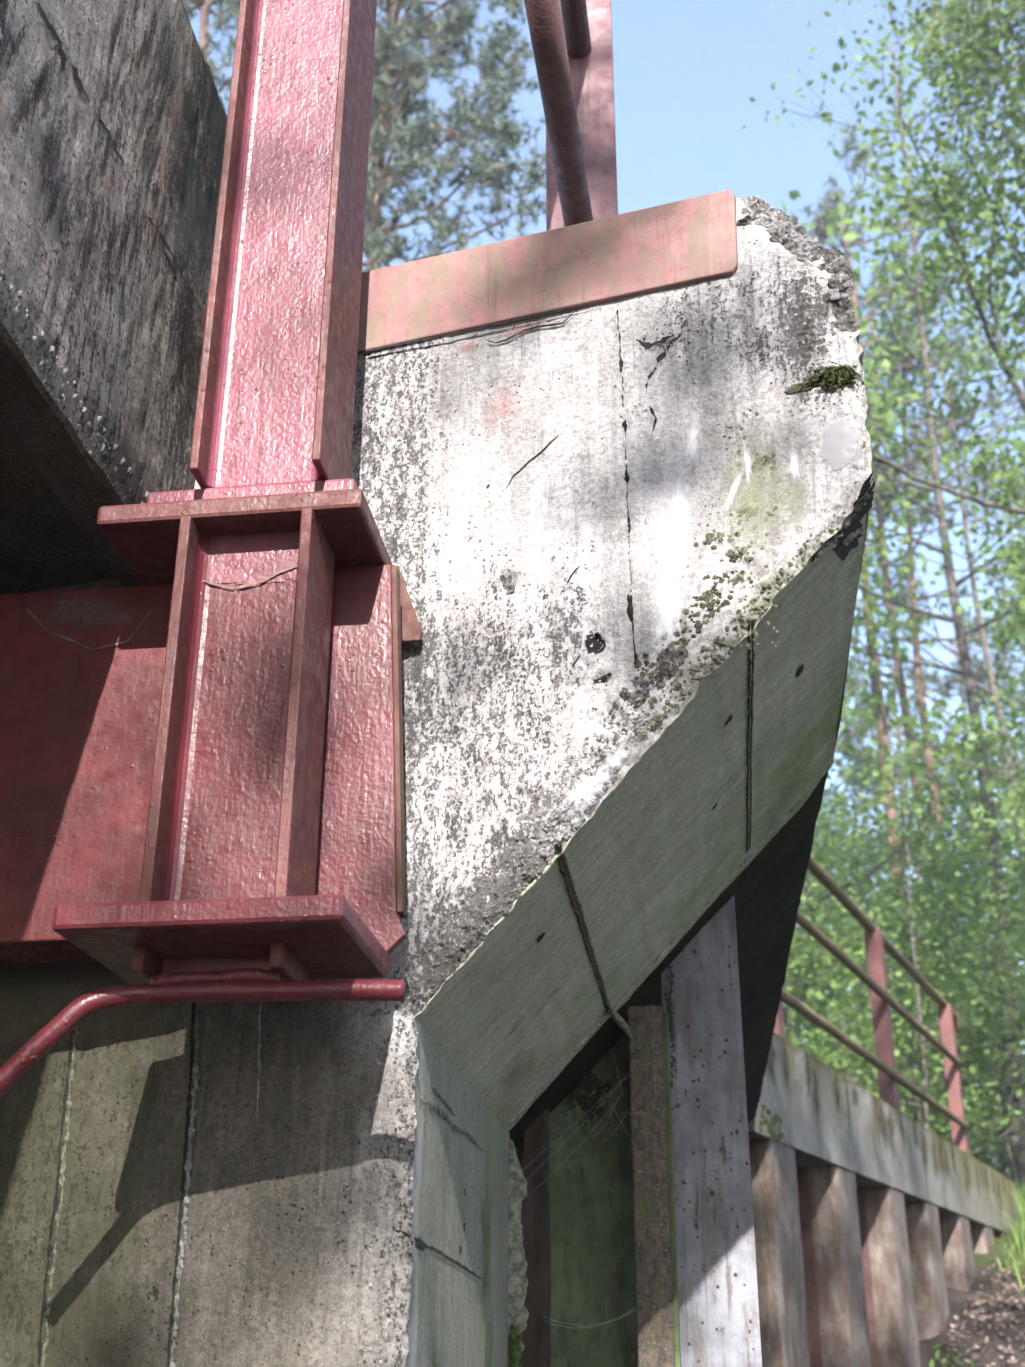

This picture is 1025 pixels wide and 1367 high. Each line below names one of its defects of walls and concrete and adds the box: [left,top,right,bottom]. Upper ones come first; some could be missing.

water stain [0,0,30,70]
water stain [6,0,214,314]
spalling [736,196,860,332]
crack [357,300,690,665]